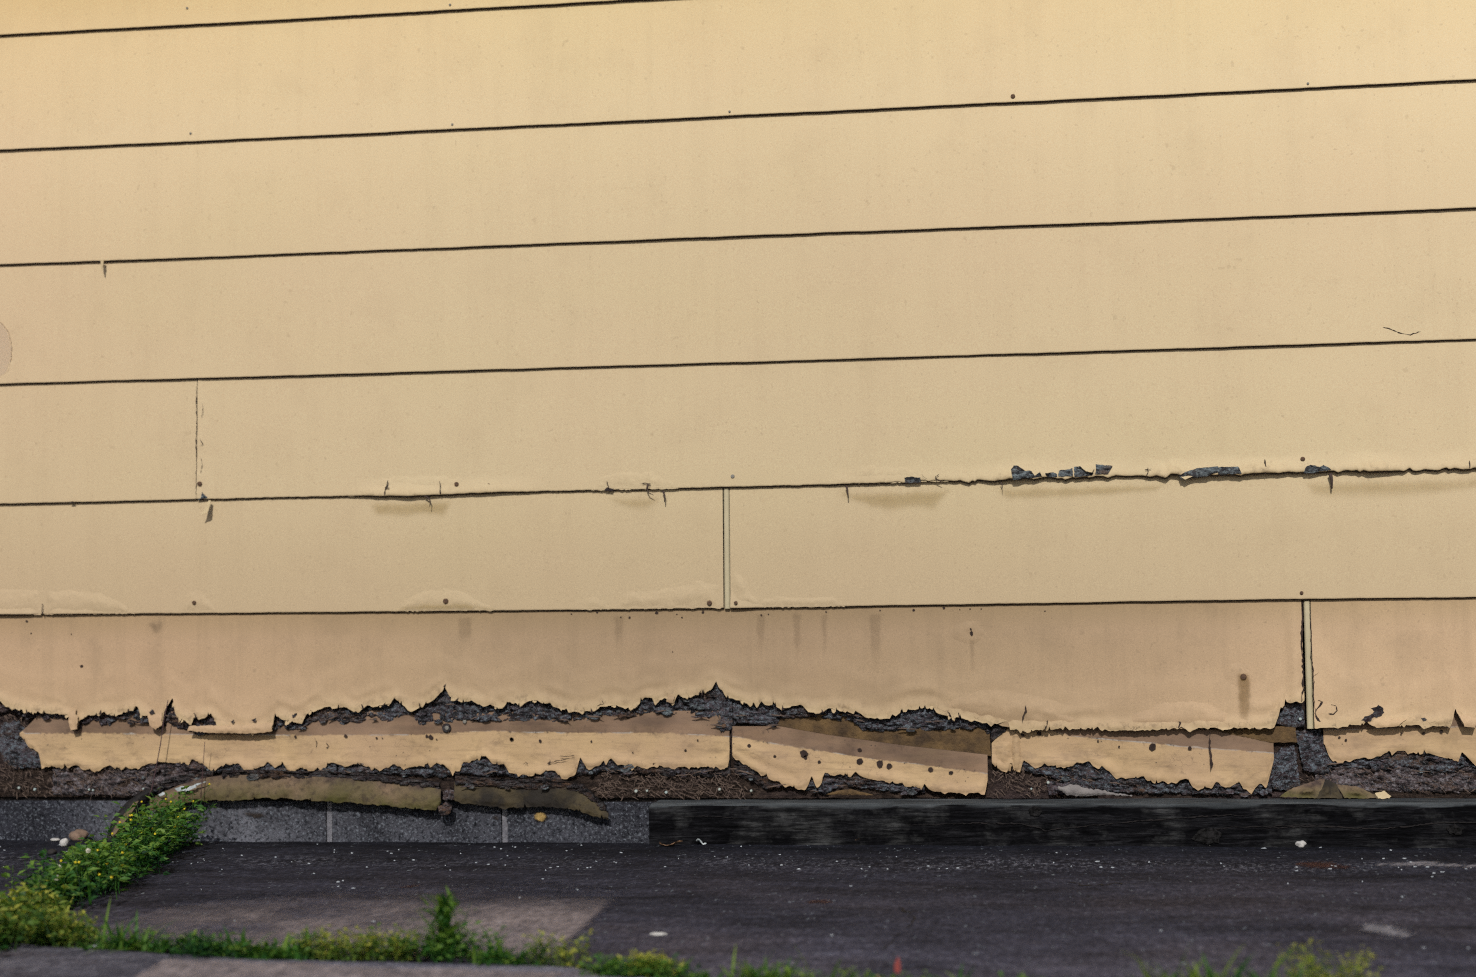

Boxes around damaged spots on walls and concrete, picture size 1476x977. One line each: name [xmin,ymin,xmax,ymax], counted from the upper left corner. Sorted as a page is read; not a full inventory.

peeling [1000,464,1112,489]
peeling [1180,466,1242,479]
peeling [1304,465,1333,489]
peeling [0,682,1006,820]
spalling [1021,701,1476,797]